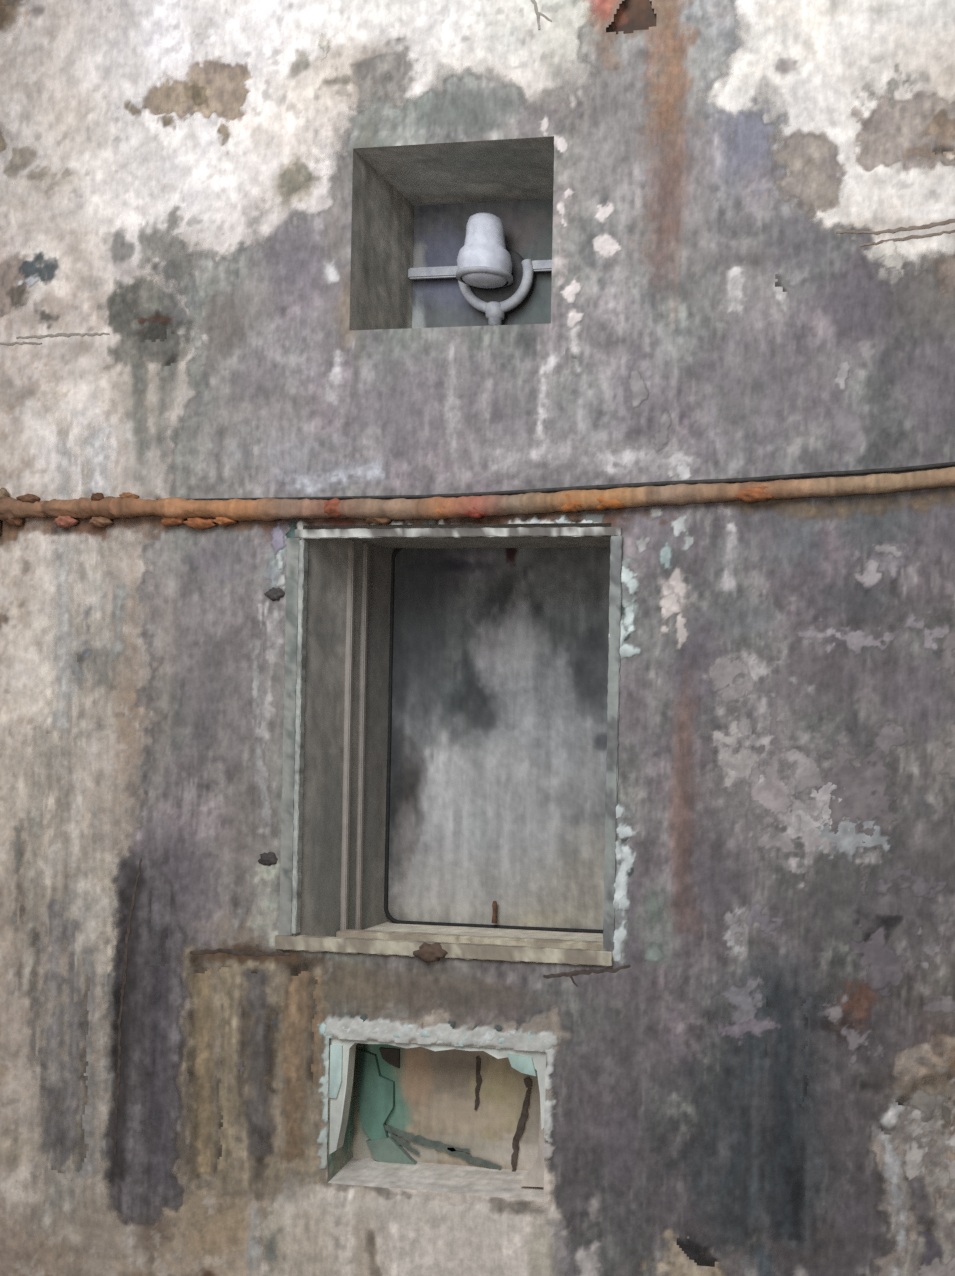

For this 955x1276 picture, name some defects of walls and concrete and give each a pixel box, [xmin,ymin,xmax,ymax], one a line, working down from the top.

peeling [169,0,955,501]
damp [58,422,110,500]
rust [0,488,450,542]
rust [463,494,625,525]
rust [725,483,955,518]
damp [12,519,187,1233]
peeling [128,486,955,1276]
peeling [101,955,119,1090]